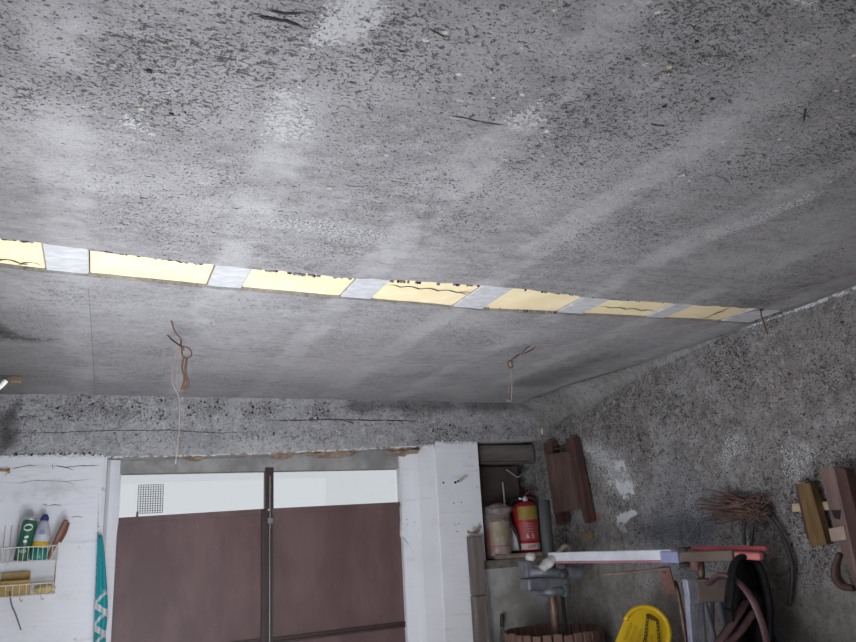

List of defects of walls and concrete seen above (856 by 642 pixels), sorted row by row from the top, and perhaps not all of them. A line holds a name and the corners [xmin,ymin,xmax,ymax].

crack [24,416,224,434]
crack [278,417,408,425]